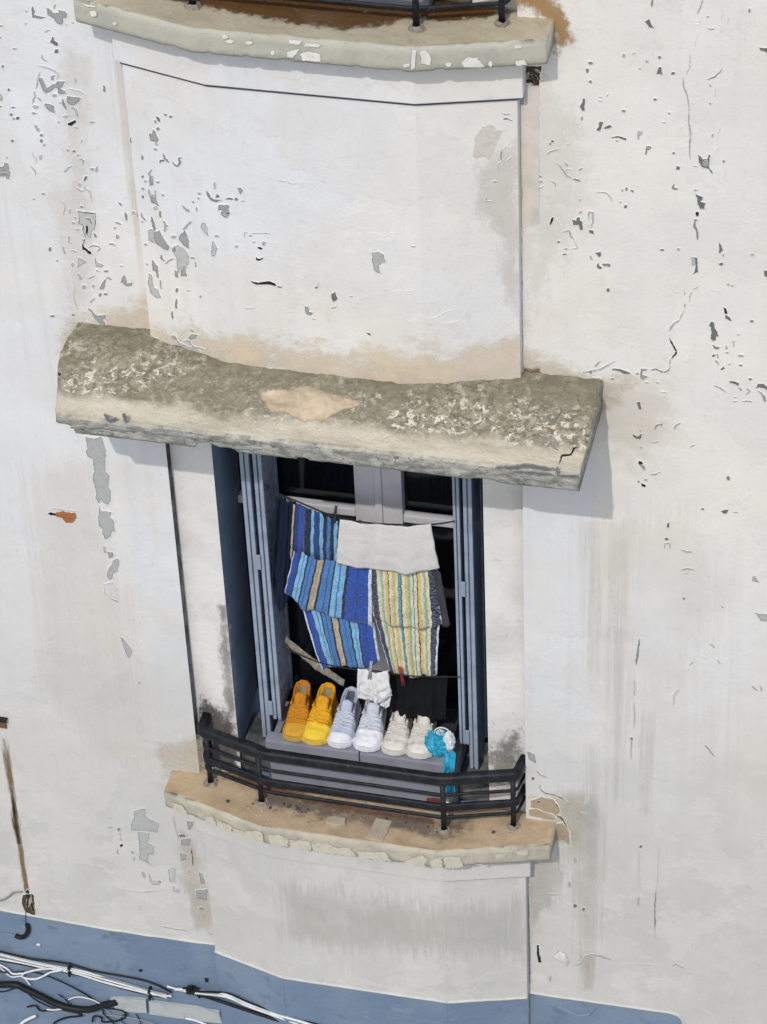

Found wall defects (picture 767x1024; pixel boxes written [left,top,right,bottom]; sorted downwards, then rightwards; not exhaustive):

rust [173,0,573,46]
peeling [0,4,245,325]
peeling [595,120,652,155]
peeling [692,188,707,240]
crack [581,286,698,393]
peeling [707,306,767,402]
peeling [261,386,360,422]
crack [537,411,581,465]
rust [48,507,79,523]
peeling [70,413,263,602]
rust [227,773,433,823]
peeling [108,802,482,910]